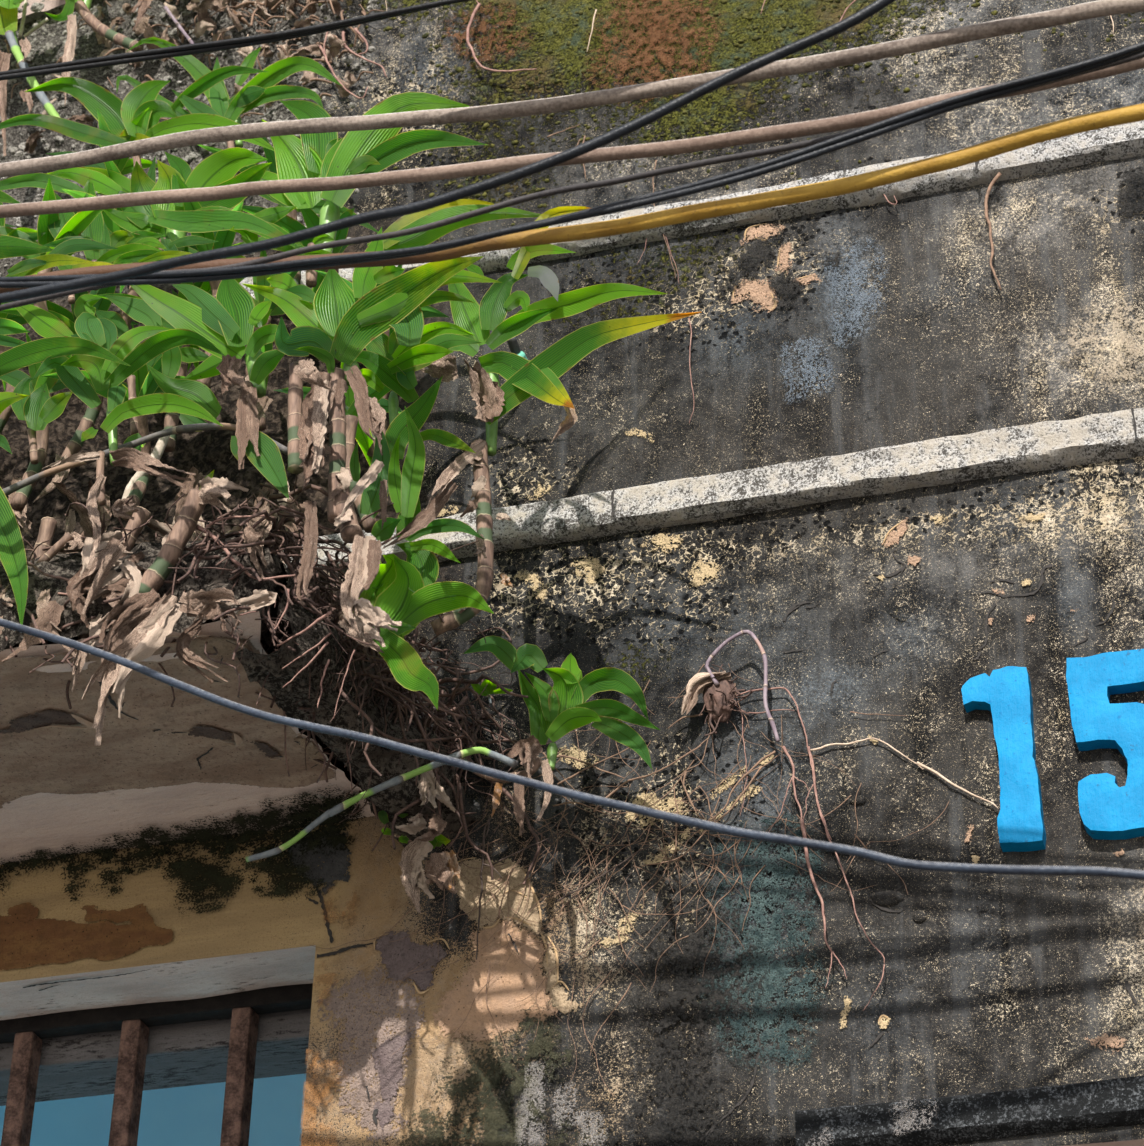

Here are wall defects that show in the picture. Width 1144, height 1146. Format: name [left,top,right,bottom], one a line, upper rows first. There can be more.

leakage [441,2,530,64]
leakage [589,0,722,89]
spalling [731,223,822,313]
leakage [0,636,370,971]
peeling [317,857,583,1144]